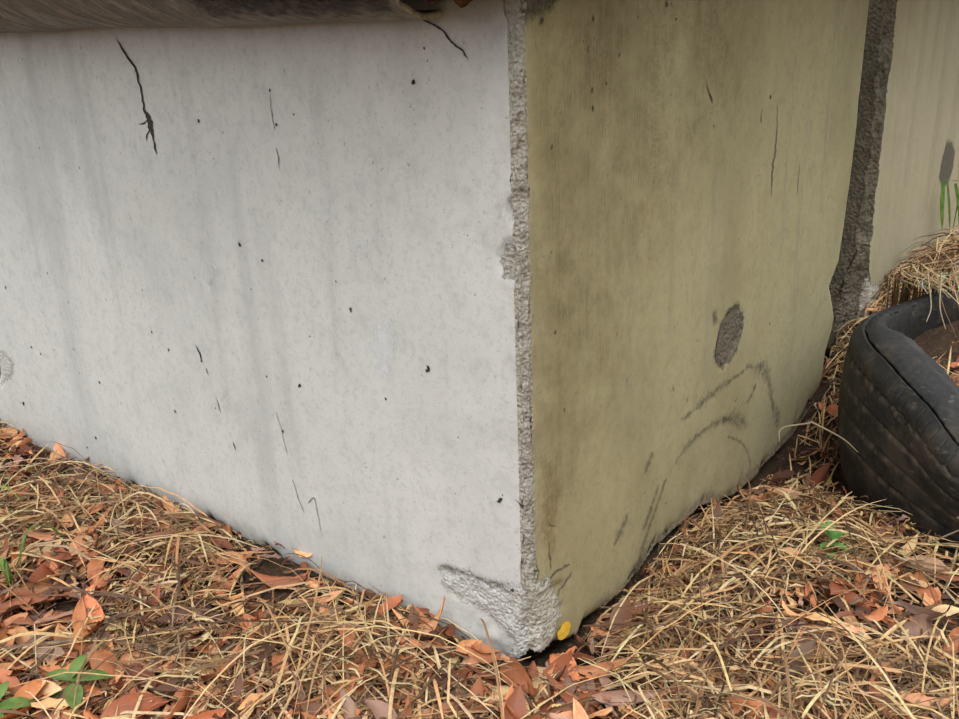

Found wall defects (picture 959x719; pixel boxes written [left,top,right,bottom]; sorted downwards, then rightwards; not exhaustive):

crack [116,39,157,155]
spalling [437,0,562,659]